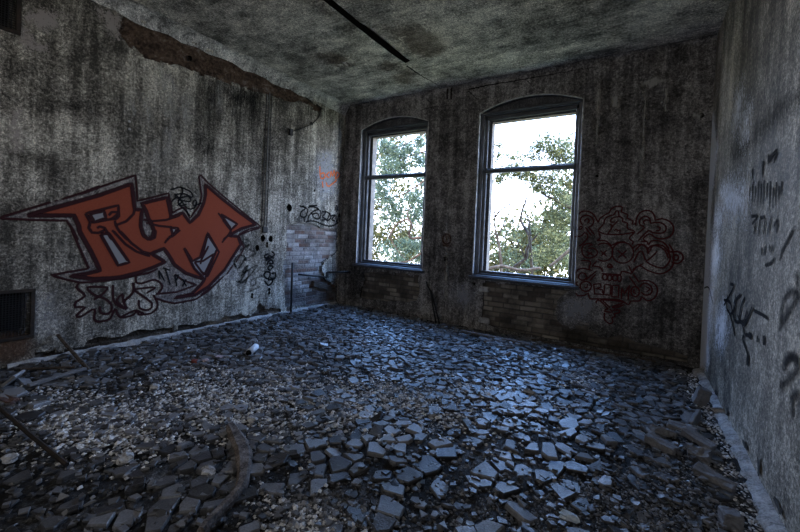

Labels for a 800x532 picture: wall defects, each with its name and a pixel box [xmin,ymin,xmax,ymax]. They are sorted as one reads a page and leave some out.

flaking render [92,2,321,111]
flaking render [35,221,339,358]